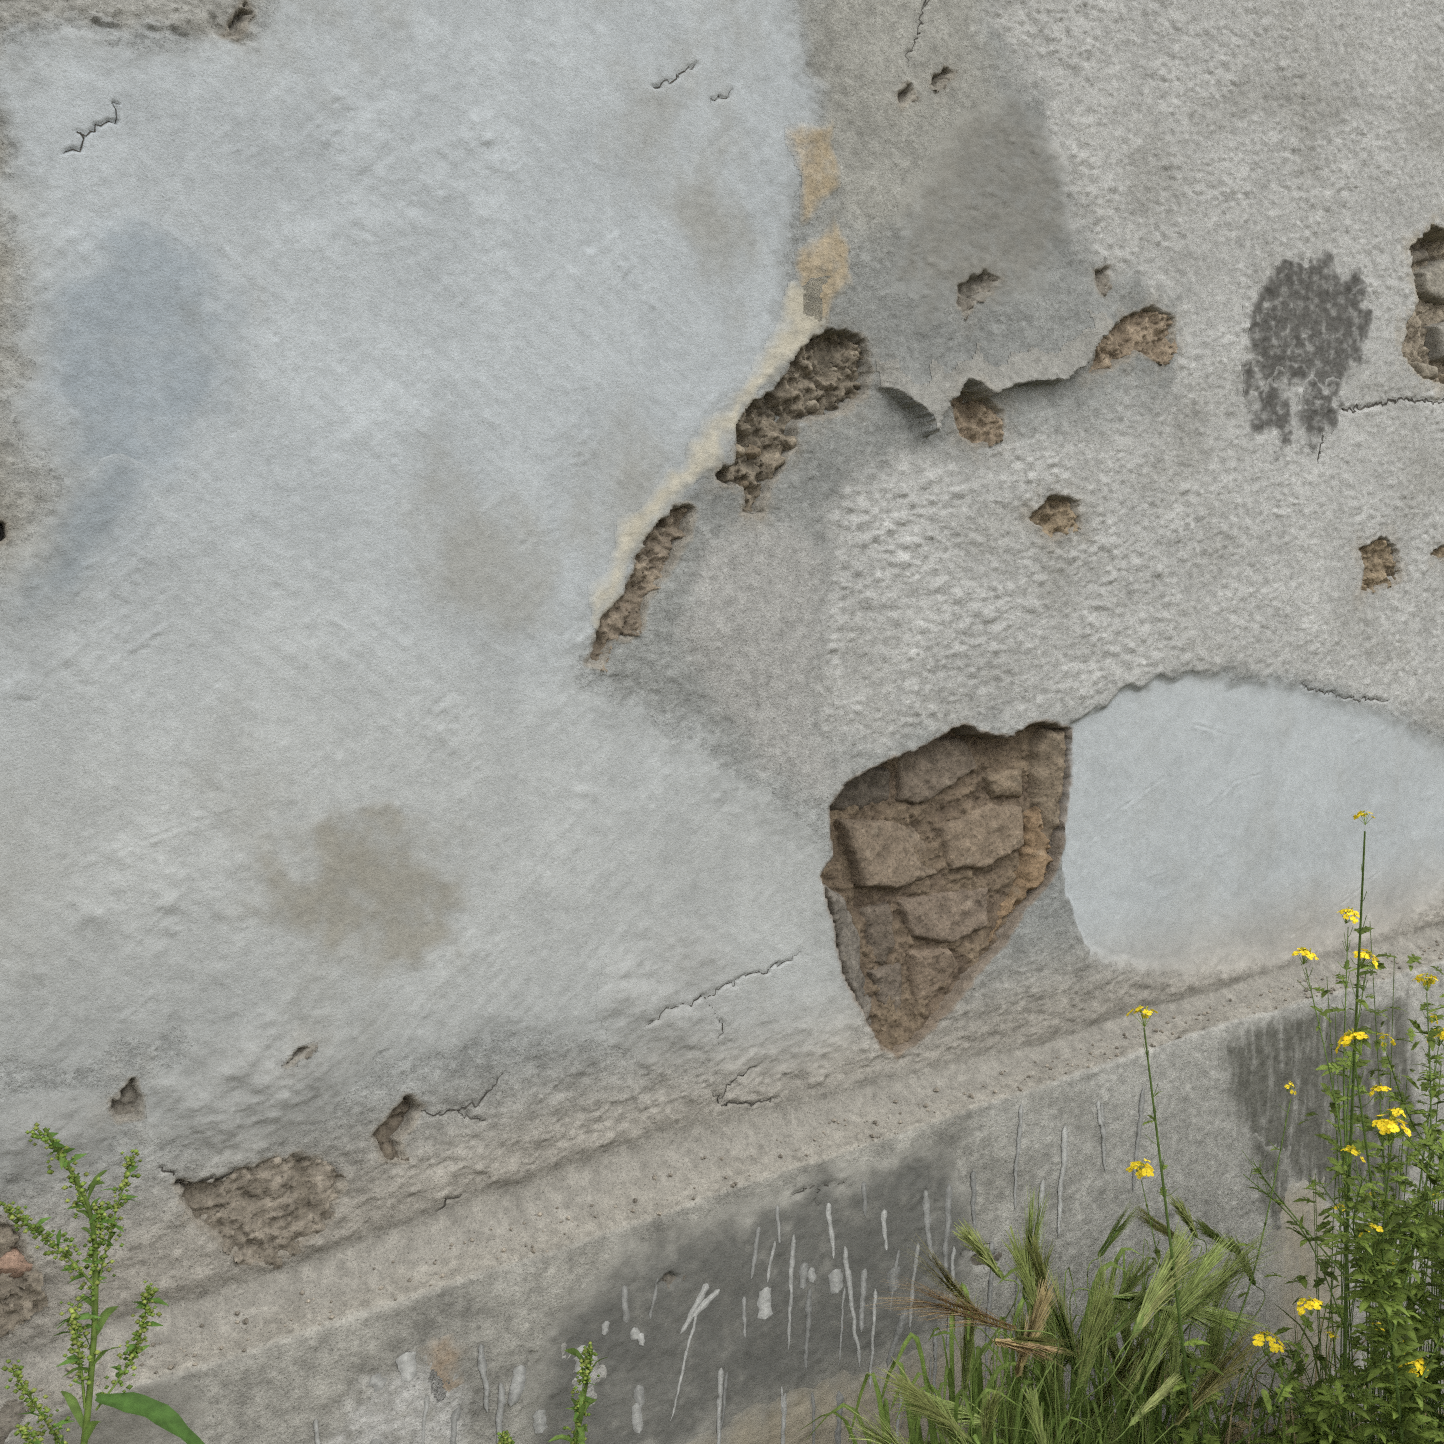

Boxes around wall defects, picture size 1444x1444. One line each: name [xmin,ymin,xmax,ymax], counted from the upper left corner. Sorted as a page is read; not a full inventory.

flaking render [229,14,255,42]
spalling [1401,240,1444,384]
flaking render [715,271,1178,513]
leakage [1241,356,1345,459]
flaking render [590,507,688,672]
flaking render [1359,539,1399,592]
spalling [820,725,1066,1050]
flaking render [177,1154,346,1269]
flaking render [0,1225,48,1337]